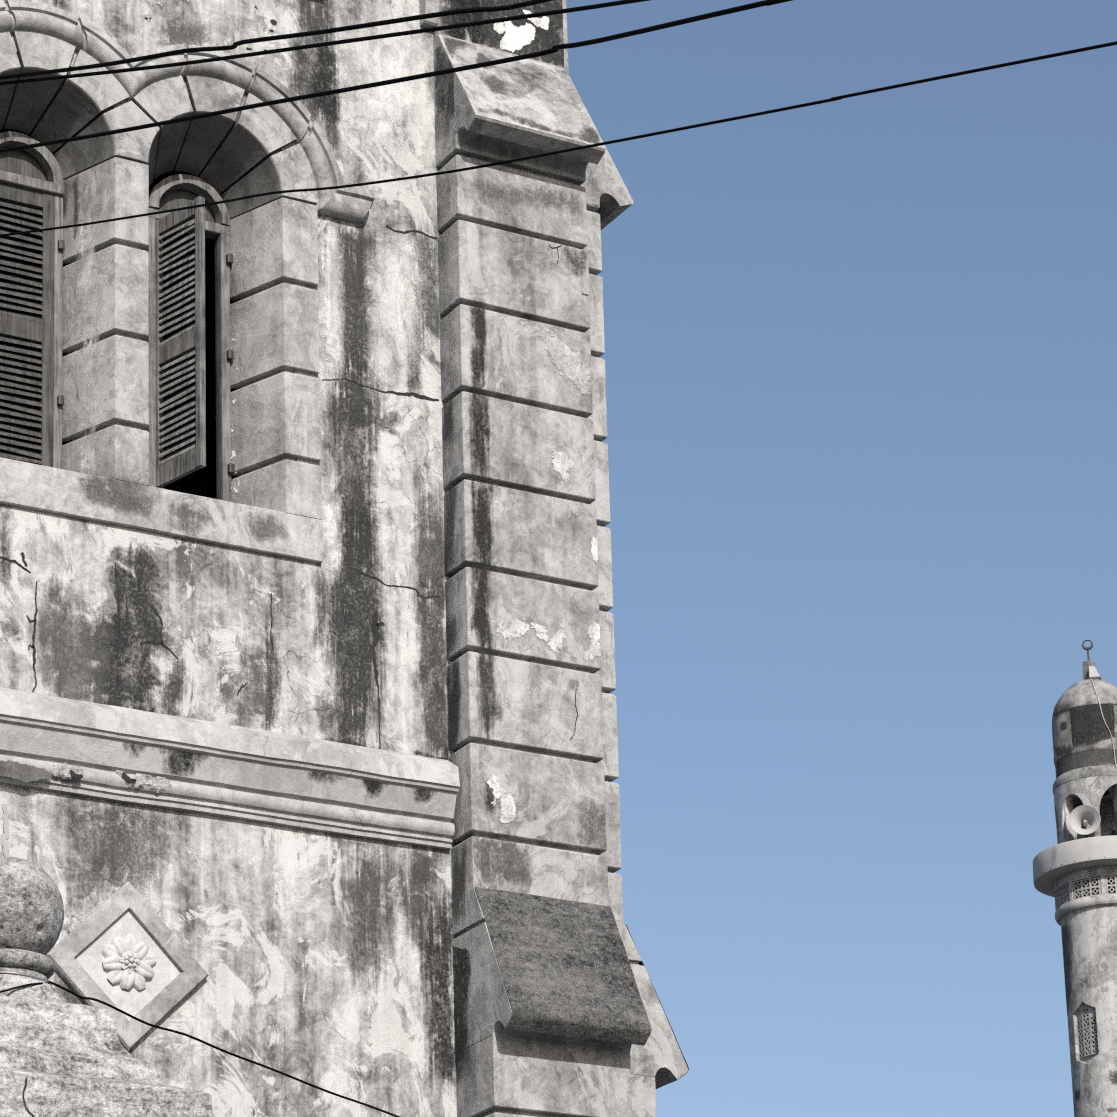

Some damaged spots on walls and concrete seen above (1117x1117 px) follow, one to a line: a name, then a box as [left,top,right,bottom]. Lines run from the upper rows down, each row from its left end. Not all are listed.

peeling [494,10,549,52]
water stain [0,0,439,747]
crack [322,378,439,401]
water stain [443,398,452,439]
water stain [470,305,501,739]
water stain [415,485,461,761]
peeling [496,616,566,653]
peeling [583,622,601,661]
flaking render [116,770,172,793]
water stain [165,748,208,775]
peeling [487,775,516,823]
crack [1,804,11,857]